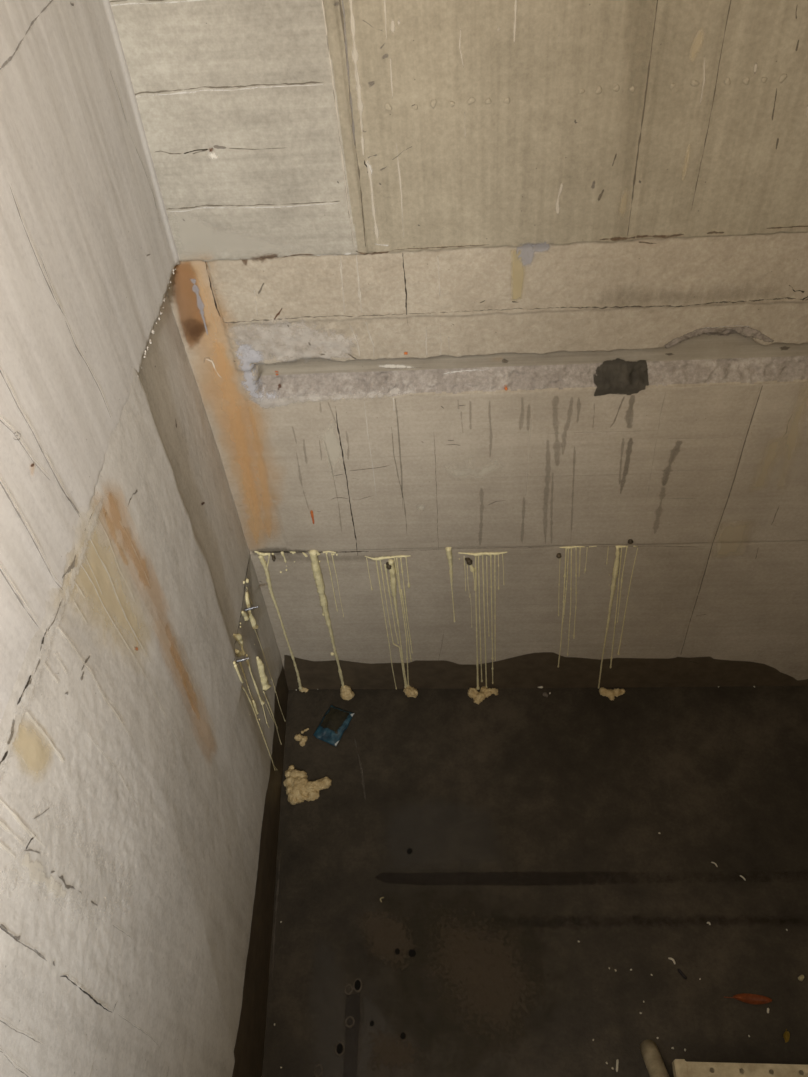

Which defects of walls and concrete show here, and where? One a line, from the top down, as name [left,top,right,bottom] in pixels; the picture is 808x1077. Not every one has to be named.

crack [0,0,53,69]
crack [109,0,378,246]
crack [627,0,658,235]
crack [692,0,731,205]
rust [175,264,204,344]
crack [205,255,808,324]
crack [0,366,80,517]
crack [0,477,64,589]
crack [0,565,40,626]